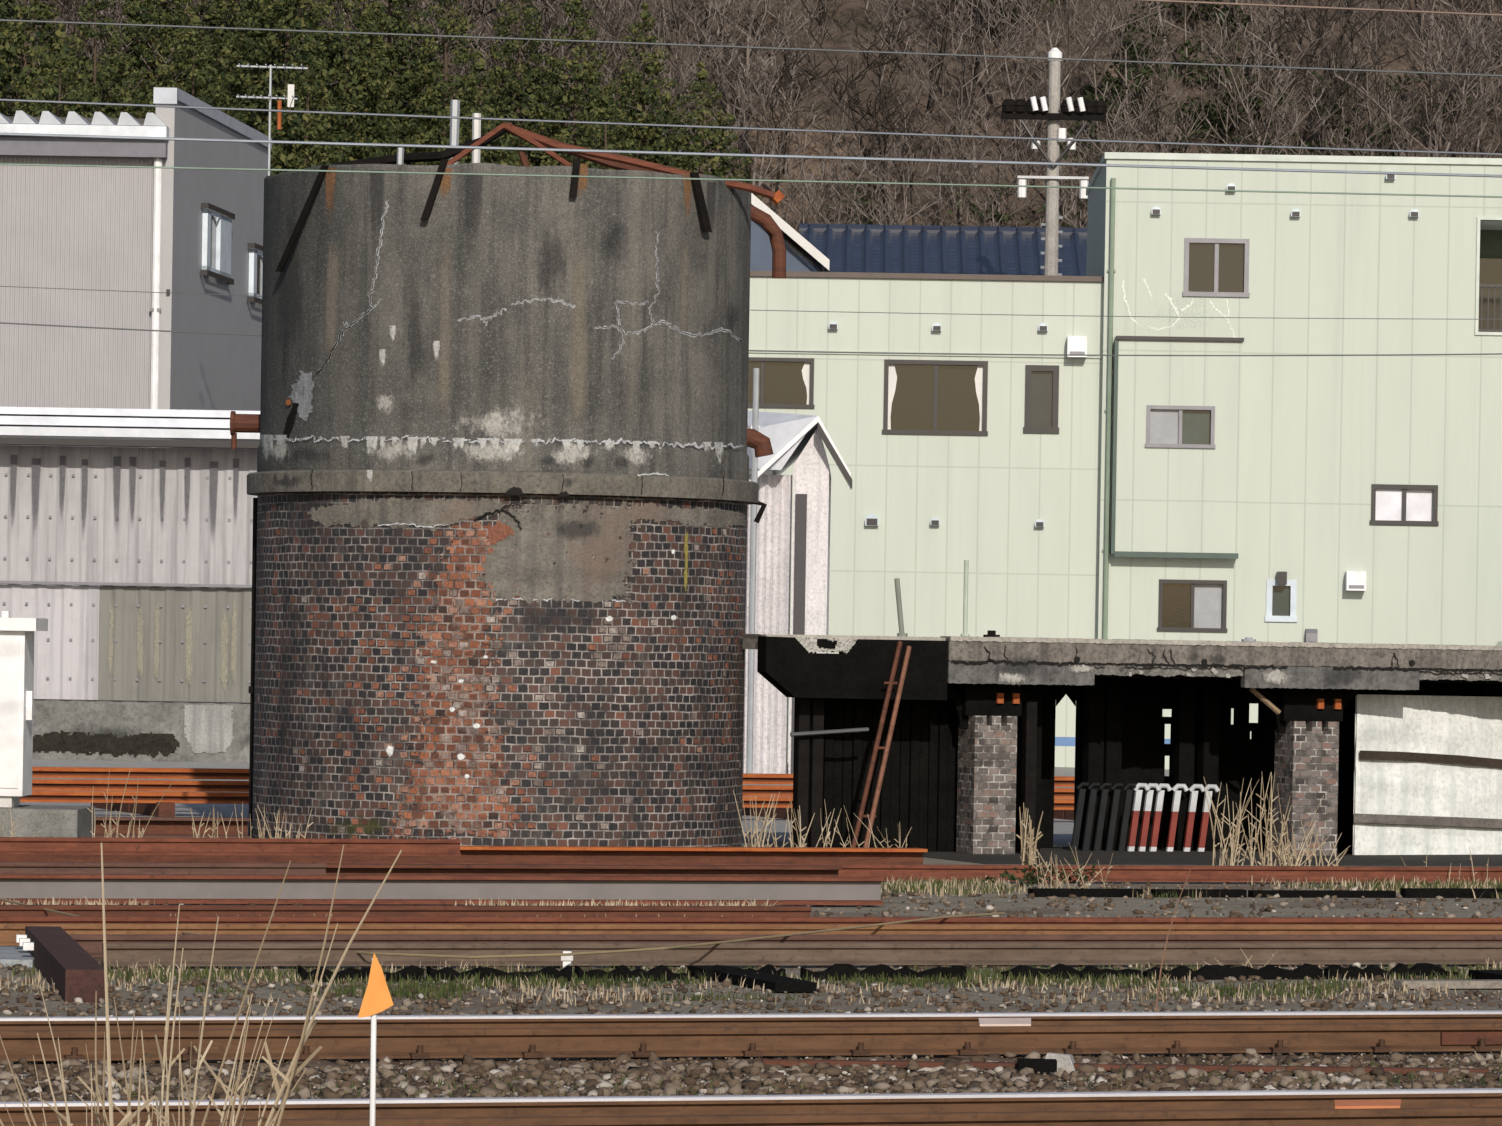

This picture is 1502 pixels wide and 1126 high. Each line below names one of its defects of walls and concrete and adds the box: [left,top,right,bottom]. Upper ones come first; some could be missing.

rust [441,168,452,194]
rust [578,164,588,189]
spalling [282,371,314,440]
crack [316,198,389,374]
rust [439,259,450,400]
leakage [261,407,741,481]
rust [571,263,586,413]
crack [458,231,742,360]
spalling [319,518,556,841]
spalling [696,516,744,719]